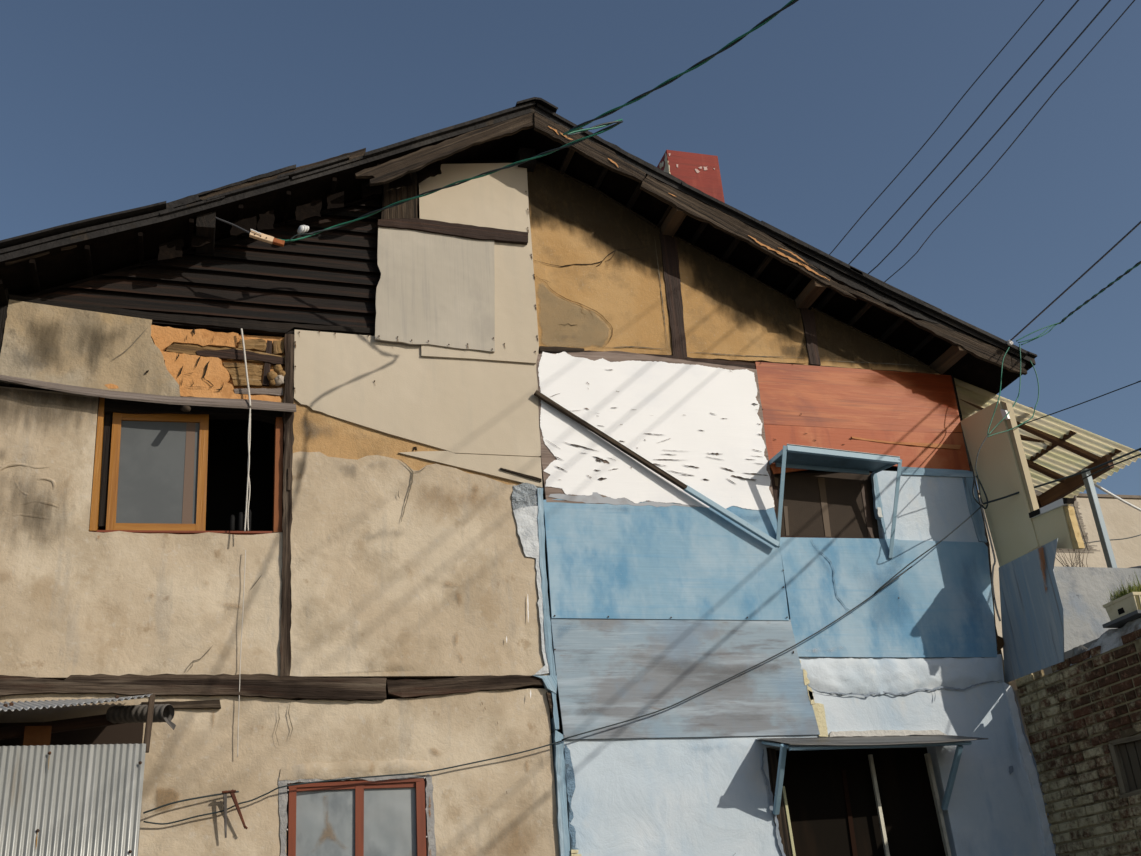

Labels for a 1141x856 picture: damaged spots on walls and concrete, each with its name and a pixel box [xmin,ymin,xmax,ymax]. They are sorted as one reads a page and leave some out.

crack [534,247,646,348]
water stain [527,160,956,409]
water stain [0,388,98,413]
spalling [151,325,522,485]
peeling [536,352,774,510]